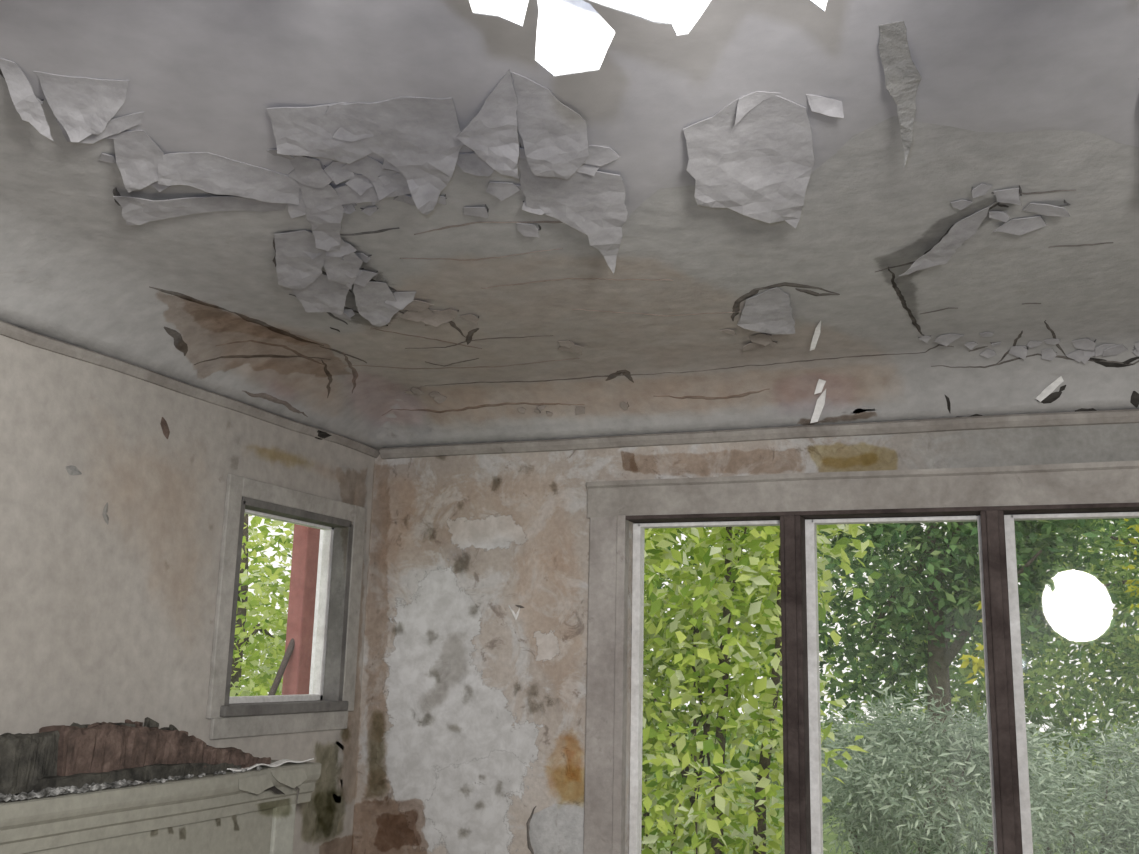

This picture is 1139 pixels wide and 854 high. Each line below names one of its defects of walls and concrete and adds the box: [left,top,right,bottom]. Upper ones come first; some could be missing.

peeling [0,0,1139,367]
crack [991,190,1076,207]
crack [1048,241,1113,249]
crack [405,303,1139,386]
peeling [244,391,308,417]
peeling [382,387,585,417]
peeling [657,389,768,400]
peeling [810,379,826,423]
peeling [446,514,528,551]
peeling [534,629,560,662]
peeling [375,559,543,854]